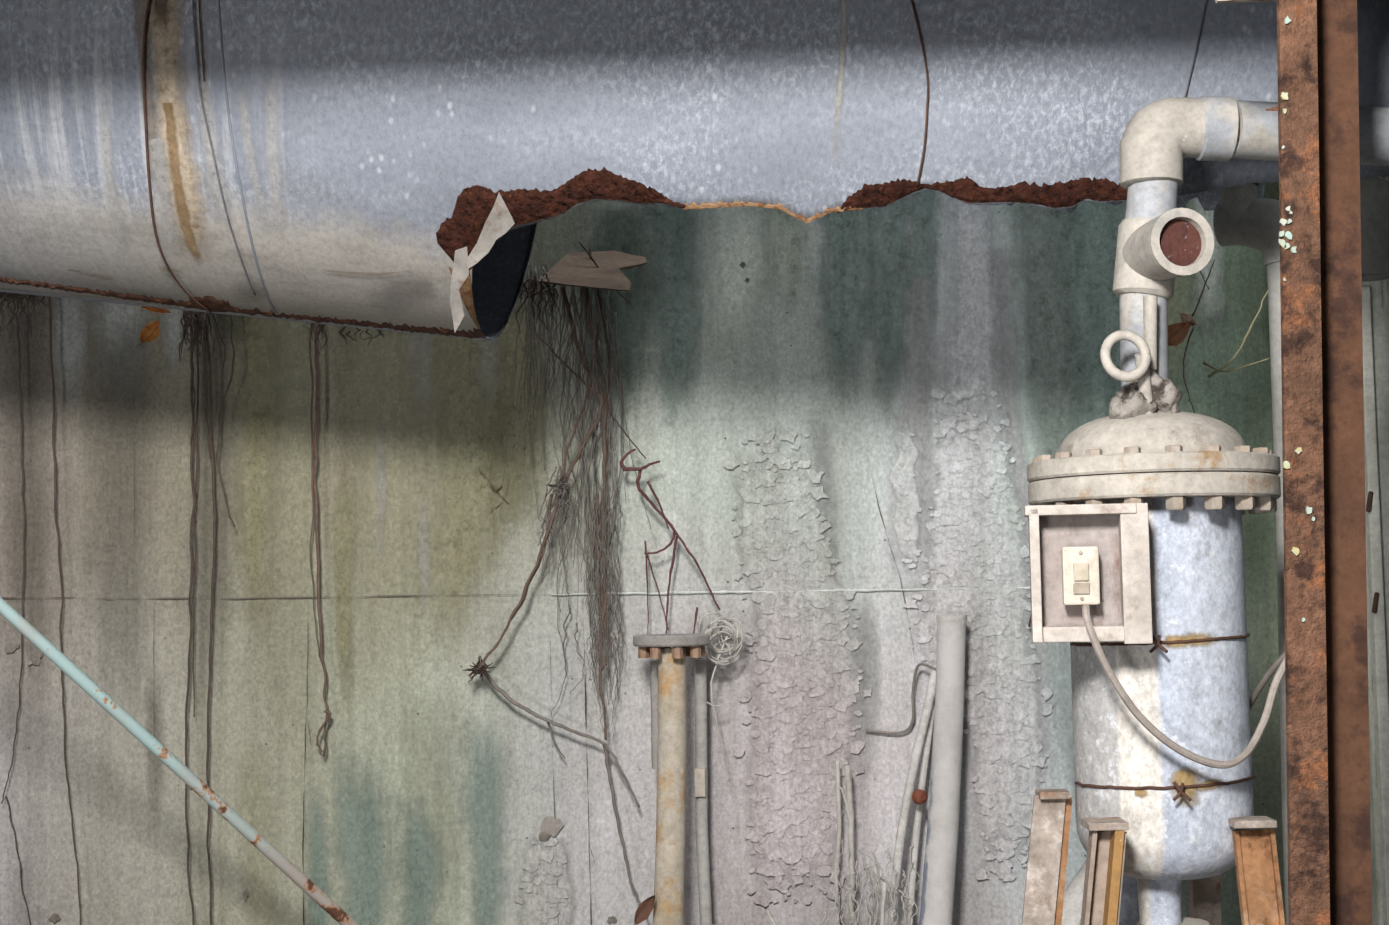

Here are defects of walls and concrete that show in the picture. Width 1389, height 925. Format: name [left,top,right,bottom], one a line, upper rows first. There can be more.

corrosion [189,296,230,311]
water stain [652,205,801,397]
water stain [870,189,1077,568]
water stain [1192,197,1220,323]